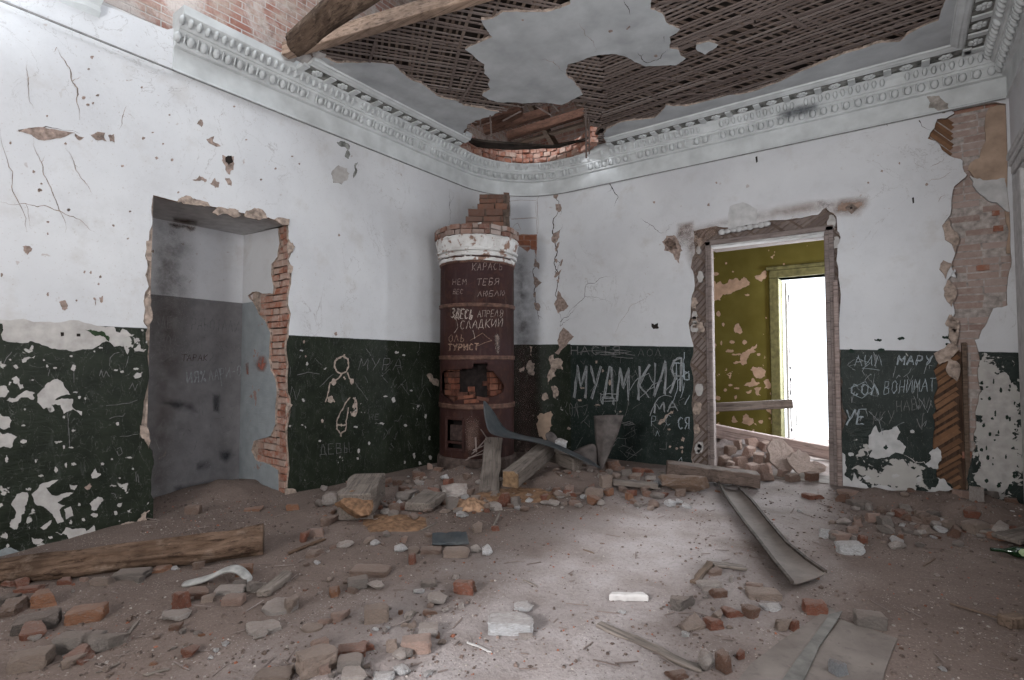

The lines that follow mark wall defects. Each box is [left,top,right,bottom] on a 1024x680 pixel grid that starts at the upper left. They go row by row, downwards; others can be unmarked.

crack [0,134,90,232]
flaking render [18,115,115,145]
crack [54,47,80,114]
flaking render [281,0,945,164]
peeling [0,292,153,418]
flaking render [177,191,305,511]
crack [510,194,606,355]
flaking render [669,203,857,465]
peeling [916,96,1017,502]
peeling [0,414,27,463]
peeling [868,425,915,459]
peeling [0,458,113,556]